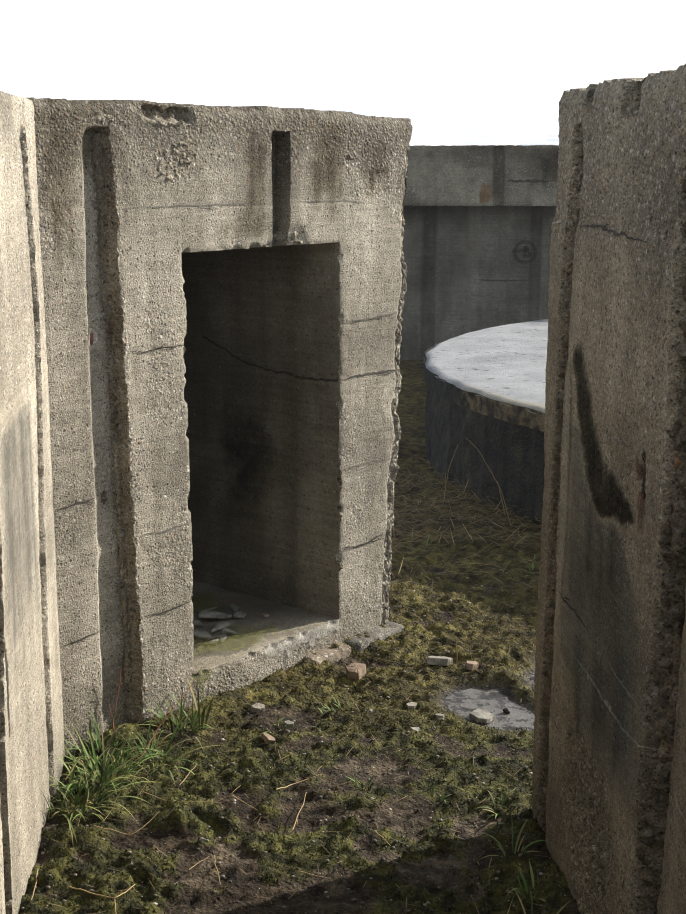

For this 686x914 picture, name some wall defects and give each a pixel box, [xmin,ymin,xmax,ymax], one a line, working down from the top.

crack [552,220,647,243]
crack [132,336,400,382]
crack [342,533,383,549]
crack [570,649,658,750]